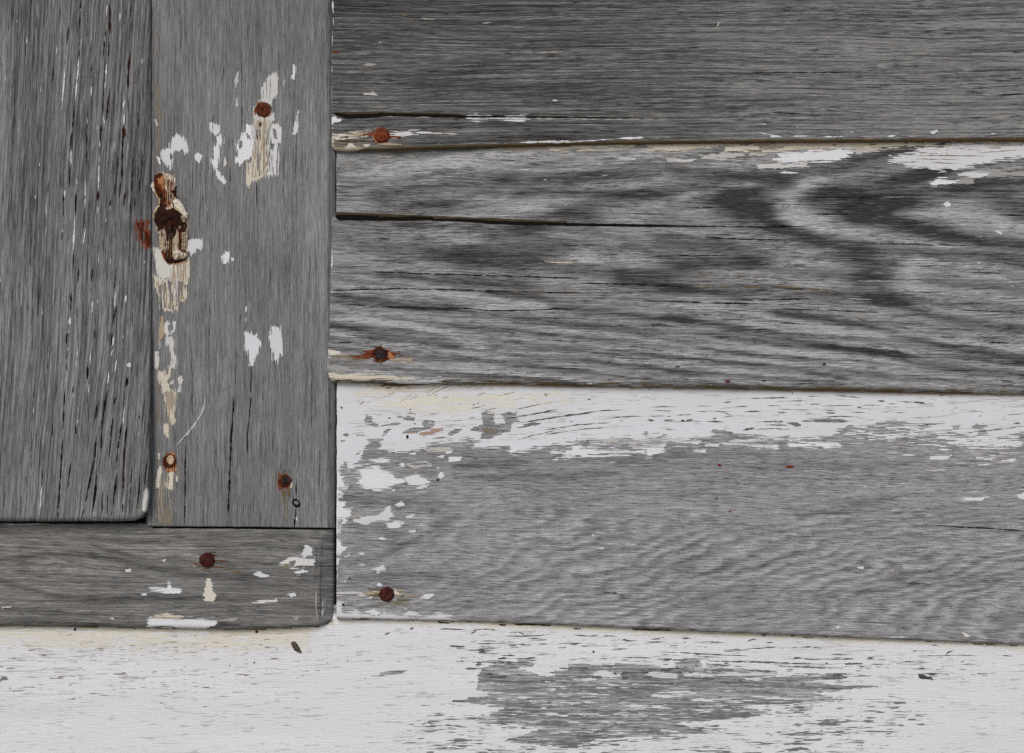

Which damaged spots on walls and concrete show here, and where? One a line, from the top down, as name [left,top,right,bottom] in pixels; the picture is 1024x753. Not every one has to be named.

rust [336,130,402,145]
peeling [488,124,1024,187]
rust [135,173,188,308]
peeling [151,64,300,440]
rust [330,346,413,364]
rust [156,451,177,524]
peeling [0,350,1024,753]